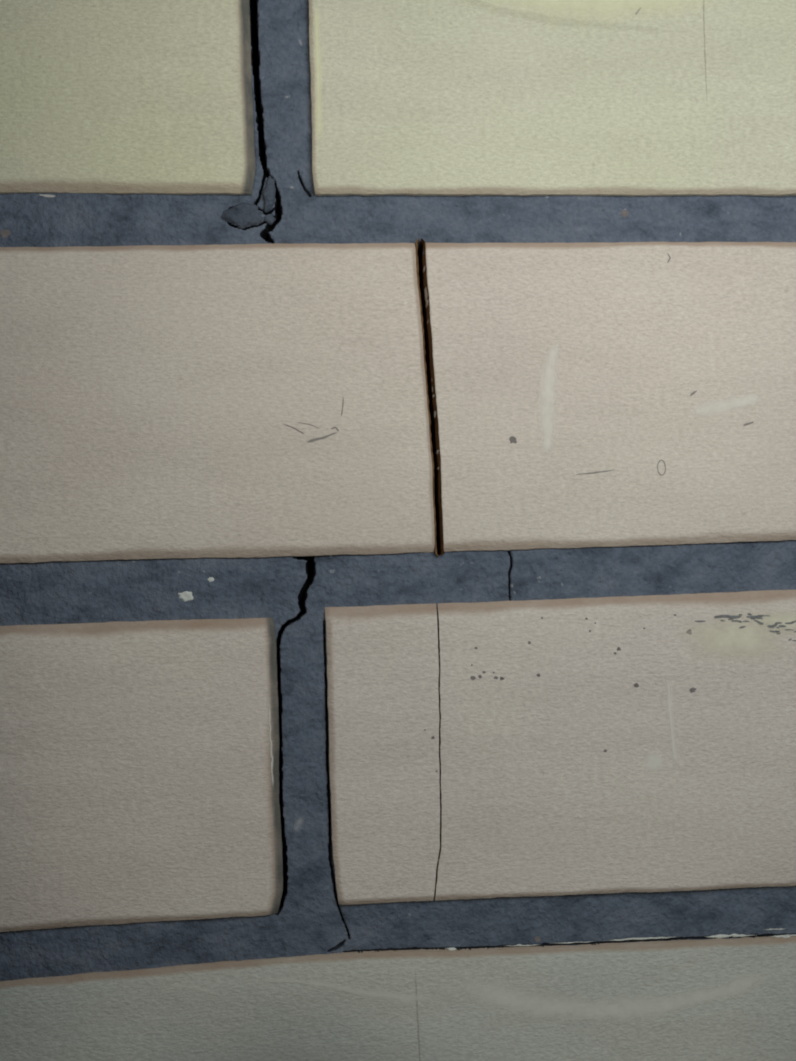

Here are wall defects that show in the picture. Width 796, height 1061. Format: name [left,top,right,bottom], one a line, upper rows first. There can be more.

spalling [221,176,276,229]
crack [228,0,310,243]
crack [415,238,444,556]
crack [276,552,791,953]